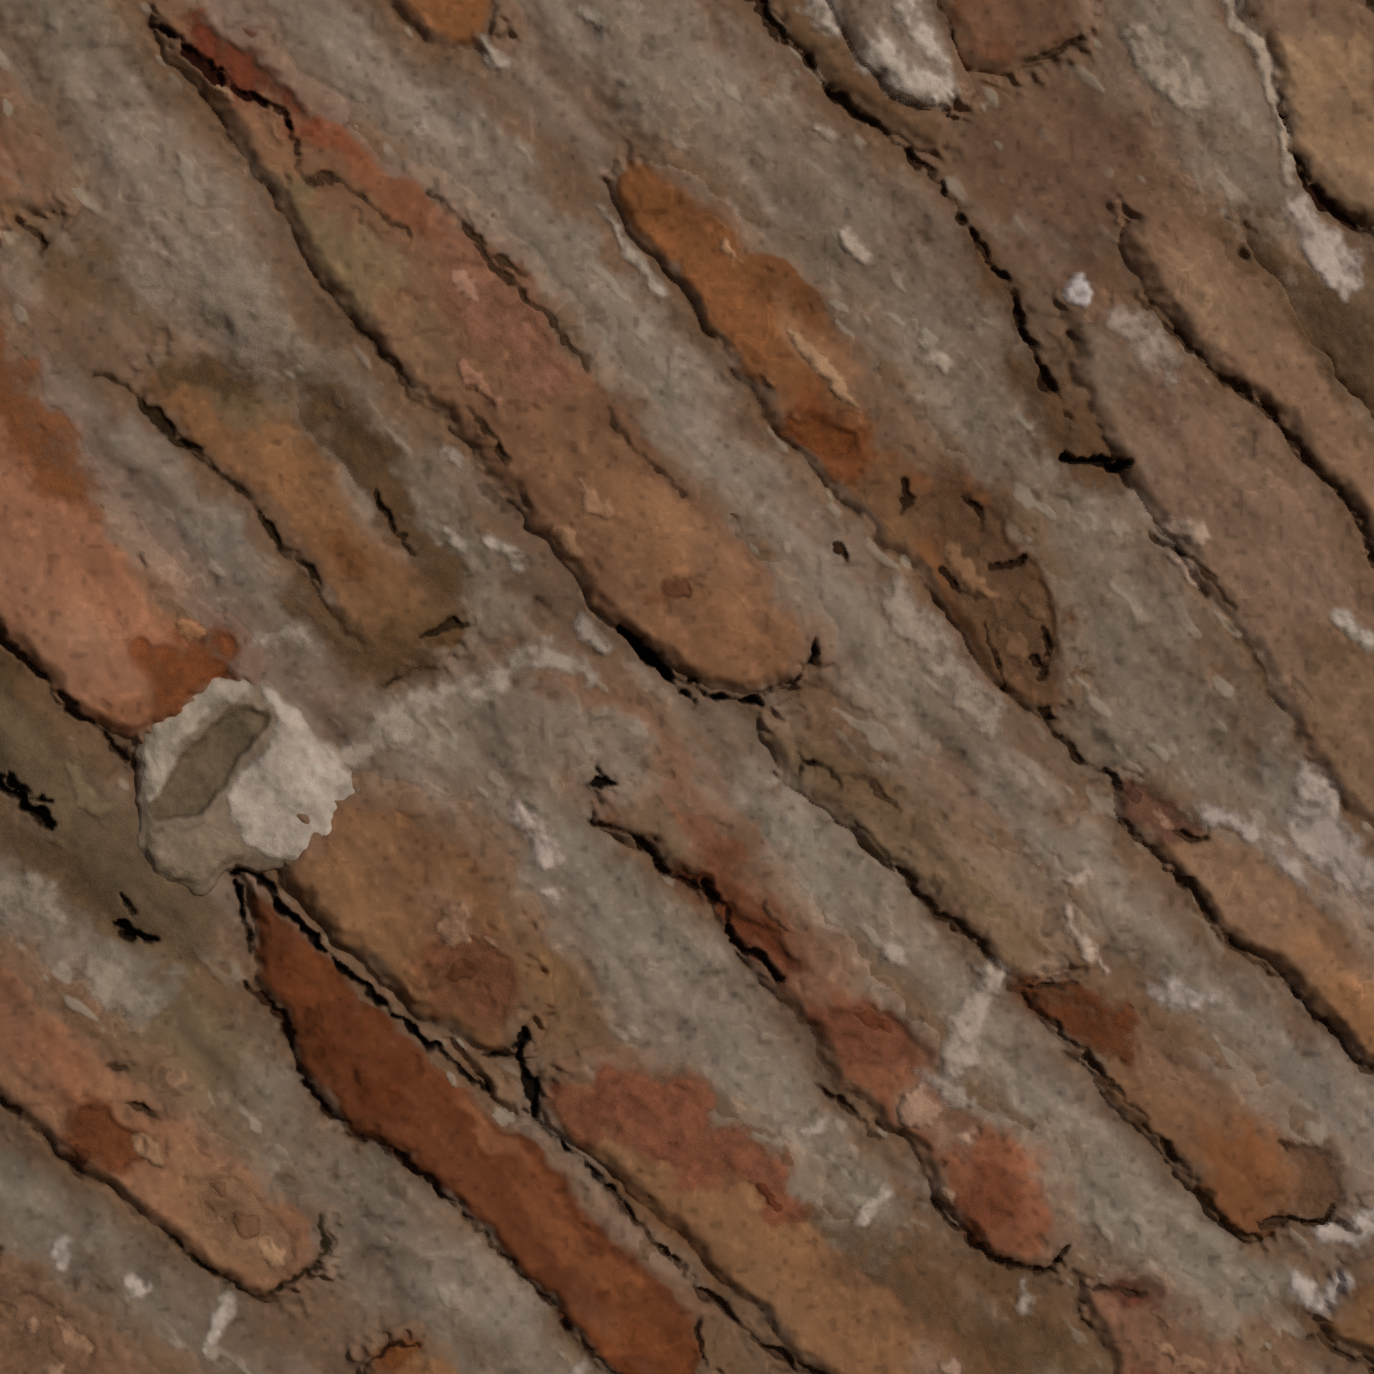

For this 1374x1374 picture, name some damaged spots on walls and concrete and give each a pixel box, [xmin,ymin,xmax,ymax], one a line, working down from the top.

damp [811,0,840,35]
damp [862,0,957,107]
damp [1121,24,1208,111]
crack [149,24,411,237]
crack [747,0,1071,419]
damp [1224,0,1374,418]
crack [1058,453,1130,473]
damp [1331,609,1374,648]
crack [0,774,55,829]
crack [114,894,157,941]
crack [590,821,783,982]
crack [230,867,825,1374]